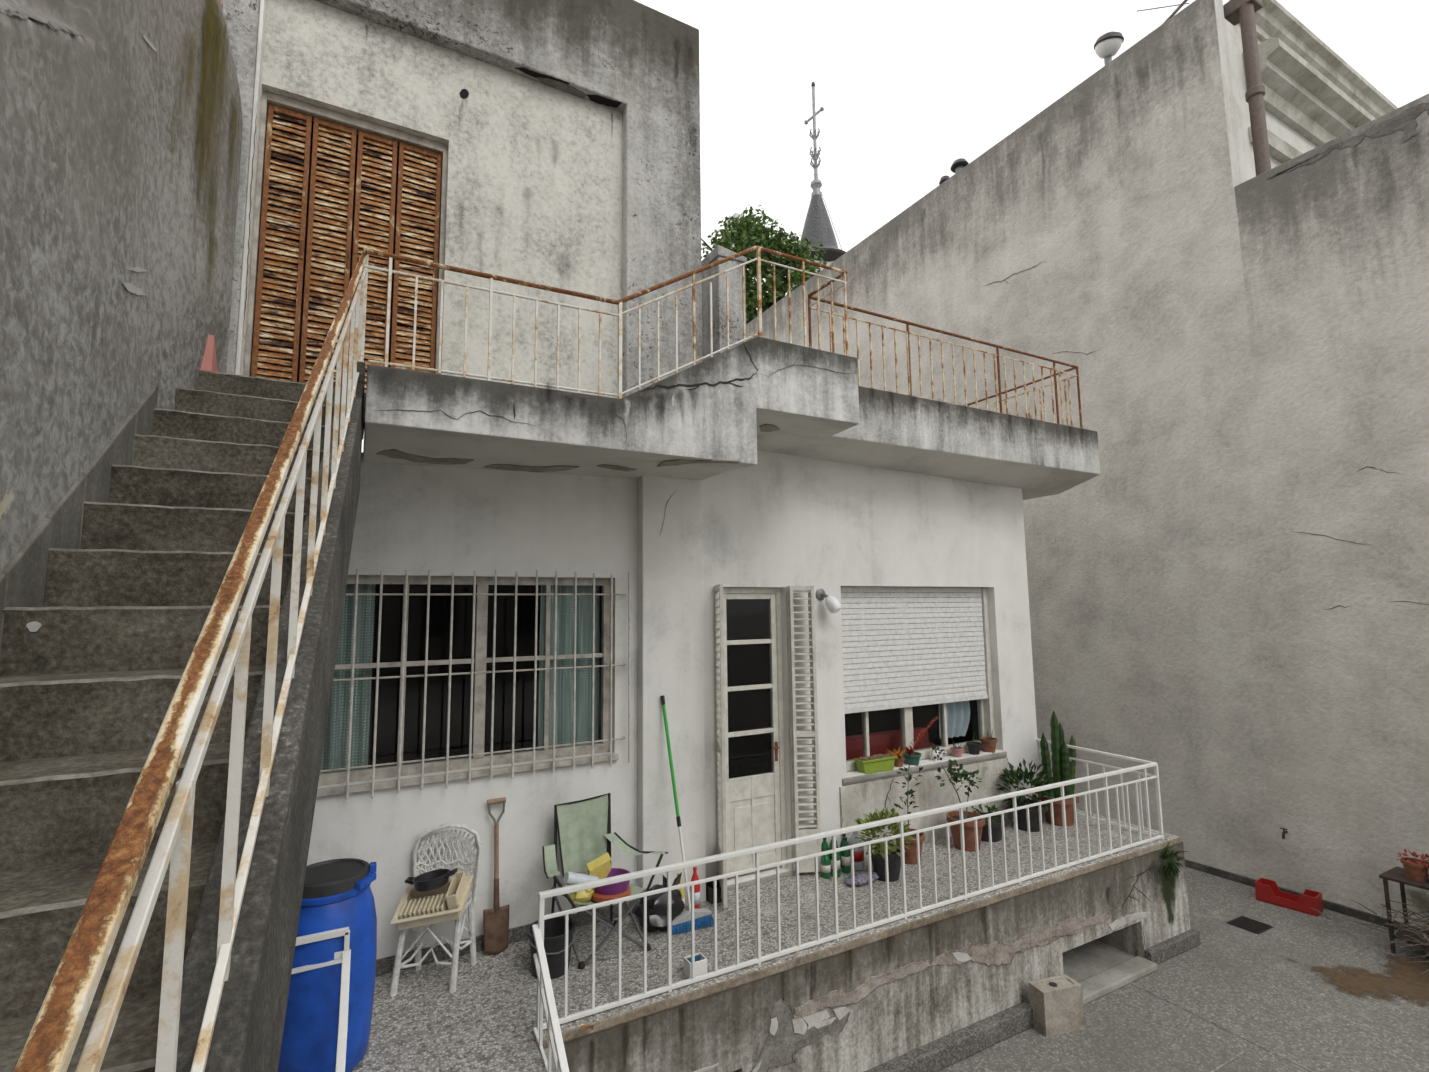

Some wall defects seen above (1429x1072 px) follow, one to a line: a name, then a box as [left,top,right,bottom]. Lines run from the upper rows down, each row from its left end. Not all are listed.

leakage [183,0,237,256]
crack [985,261,1045,286]
crack [374,380,535,426]
crack [604,343,853,440]
peeling [376,449,579,472]
peeling [597,464,637,472]
peeling [657,459,740,467]
peeling [0,491,15,519]
spalling [749,912,1151,1072]